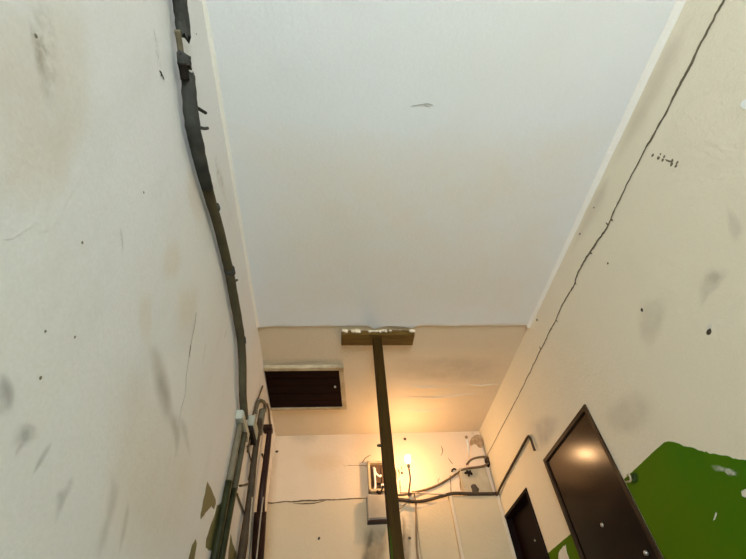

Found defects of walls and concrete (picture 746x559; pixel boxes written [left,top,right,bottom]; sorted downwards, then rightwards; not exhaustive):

crack [487,0,725,455]
peeling [201,482,221,551]